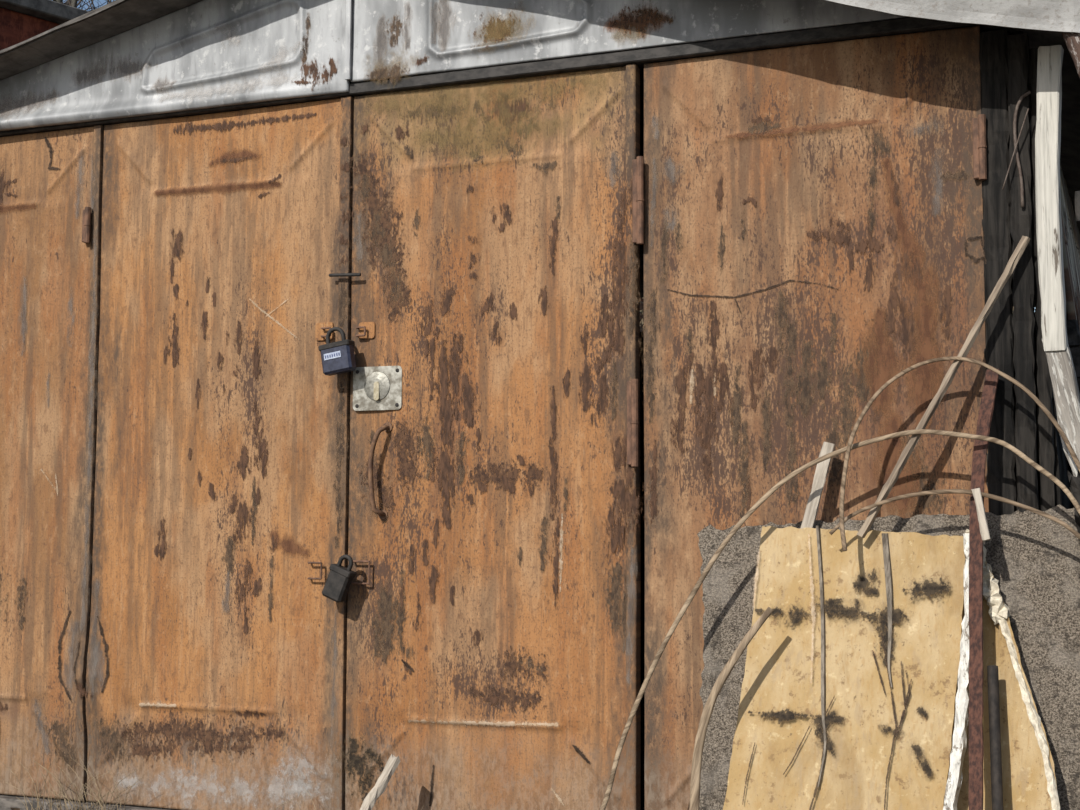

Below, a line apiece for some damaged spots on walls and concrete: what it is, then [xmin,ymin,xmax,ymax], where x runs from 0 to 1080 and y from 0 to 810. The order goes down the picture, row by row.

rust [294,14,337,91]
rust [607,0,673,38]
rust [173,113,316,136]
rust [155,174,281,199]
rust [164,314,179,368]
rust [169,228,188,305]
crack [667,280,839,313]
rust [670,146,953,518]
rust [221,402,308,633]
rust [408,287,484,629]
rust [539,330,611,606]
rust [604,437,660,557]